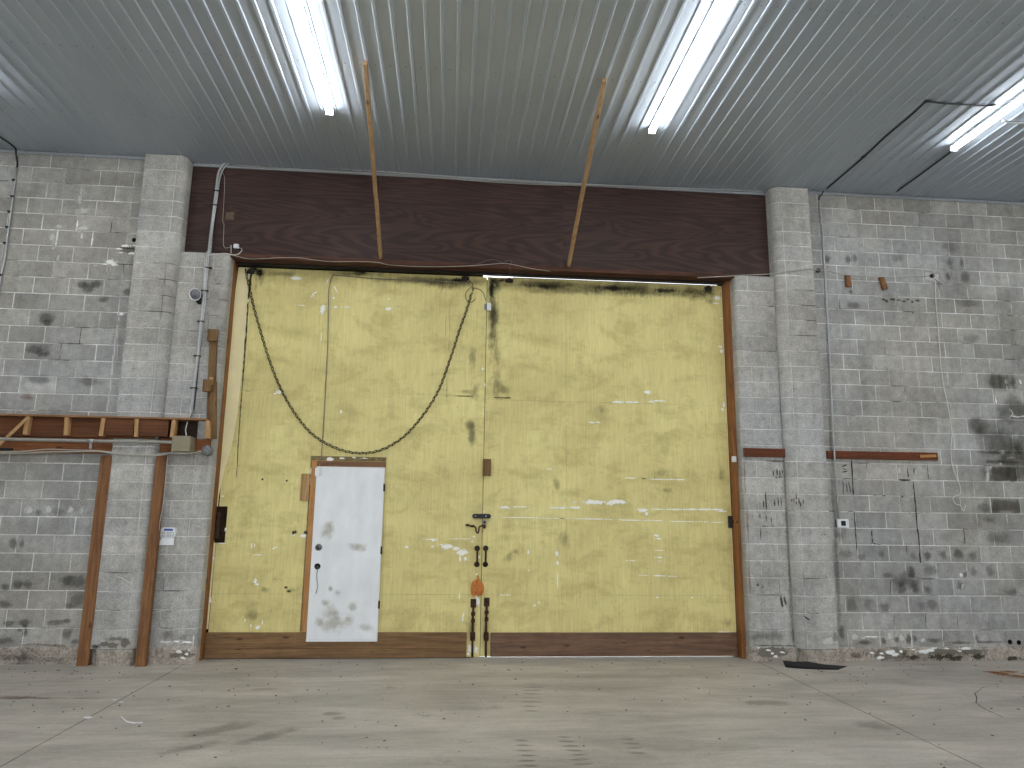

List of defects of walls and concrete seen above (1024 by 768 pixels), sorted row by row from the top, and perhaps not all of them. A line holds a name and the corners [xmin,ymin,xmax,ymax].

water stain [596,285,711,293]
water stain [490,279,504,337]
peeling [483,499,727,558]
peeling [425,536,480,562]
spalling [754,646,794,658]
spalling [863,647,987,661]